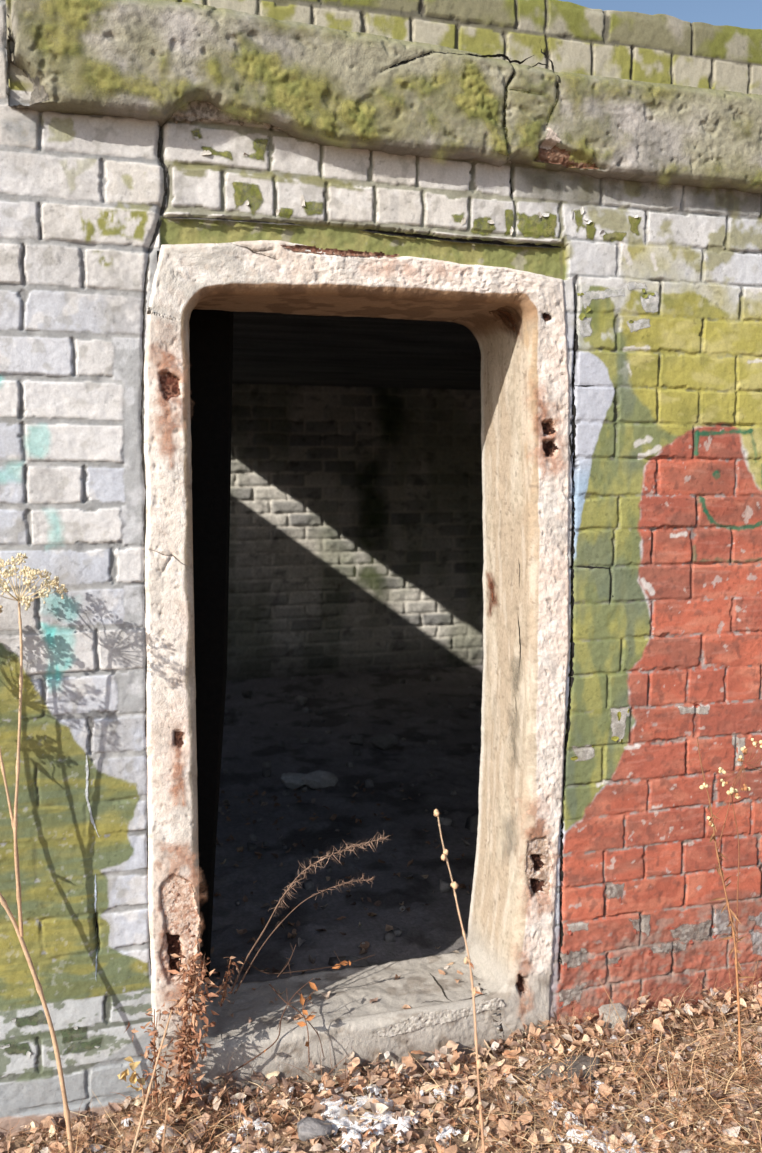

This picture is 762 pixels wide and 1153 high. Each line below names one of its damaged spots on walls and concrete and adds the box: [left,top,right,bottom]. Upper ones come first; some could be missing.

crack [385,46,561,194]
crack [362,229,565,248]
corrosion [158,352,183,451]
crack [140,126,306,615]
crack [558,284,613,979]
crack [142,651,150,774]
corrosion [172,745,185,805]
spalling [160,874,200,985]
peeling [748,912,762,961]
peeling [0,1042,31,1058]
peeling [12,1010,48,1027]
peeling [60,1026,102,1055]